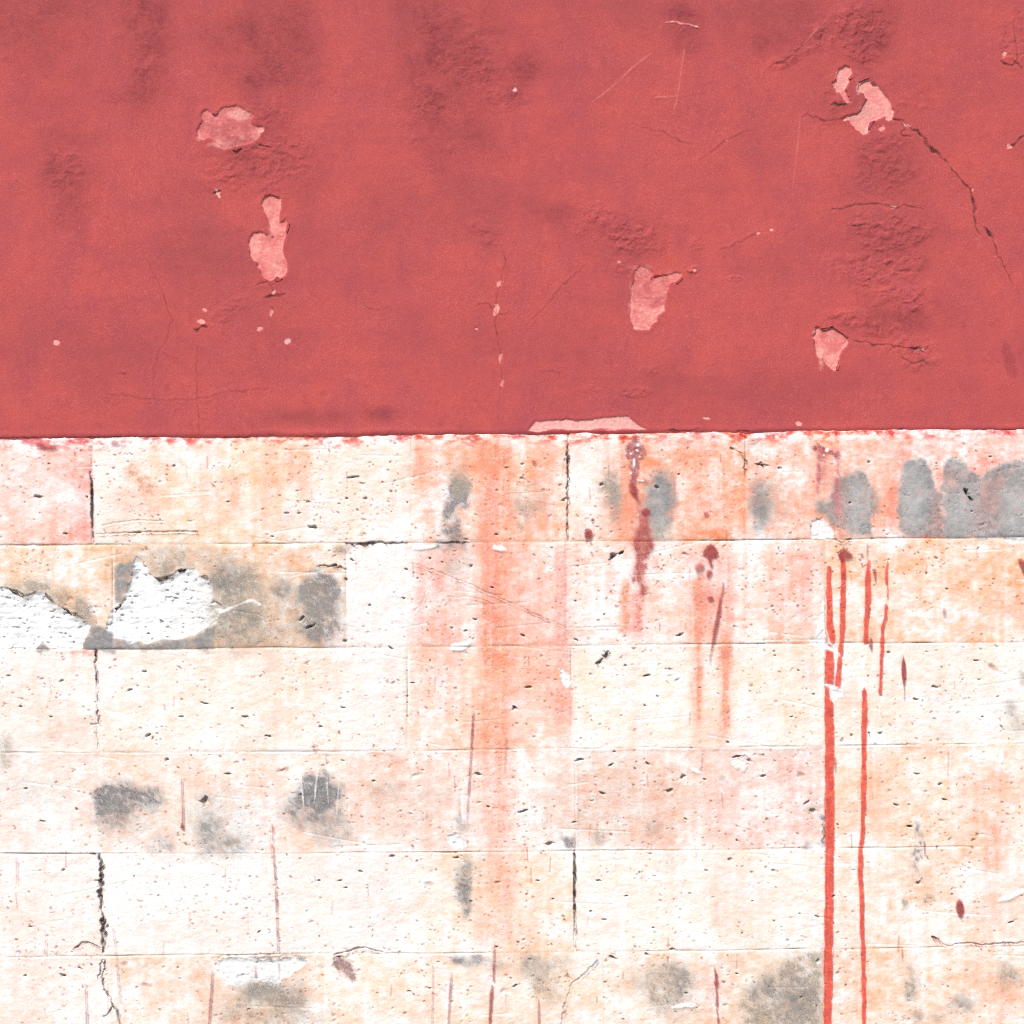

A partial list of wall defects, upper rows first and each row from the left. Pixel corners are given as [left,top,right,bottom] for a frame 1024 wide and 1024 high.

peeling [197,106,263,149]
peeling [832,66,893,134]
peeling [249,193,289,294]
peeling [630,266,682,330]
peeling [530,417,644,432]
water stain [817,471,878,534]
water stain [897,458,1024,539]
spalling [0,557,222,652]
water stain [205,560,341,649]
water stain [94,782,161,827]
water stain [285,770,341,826]
crack [98,855,119,1013]